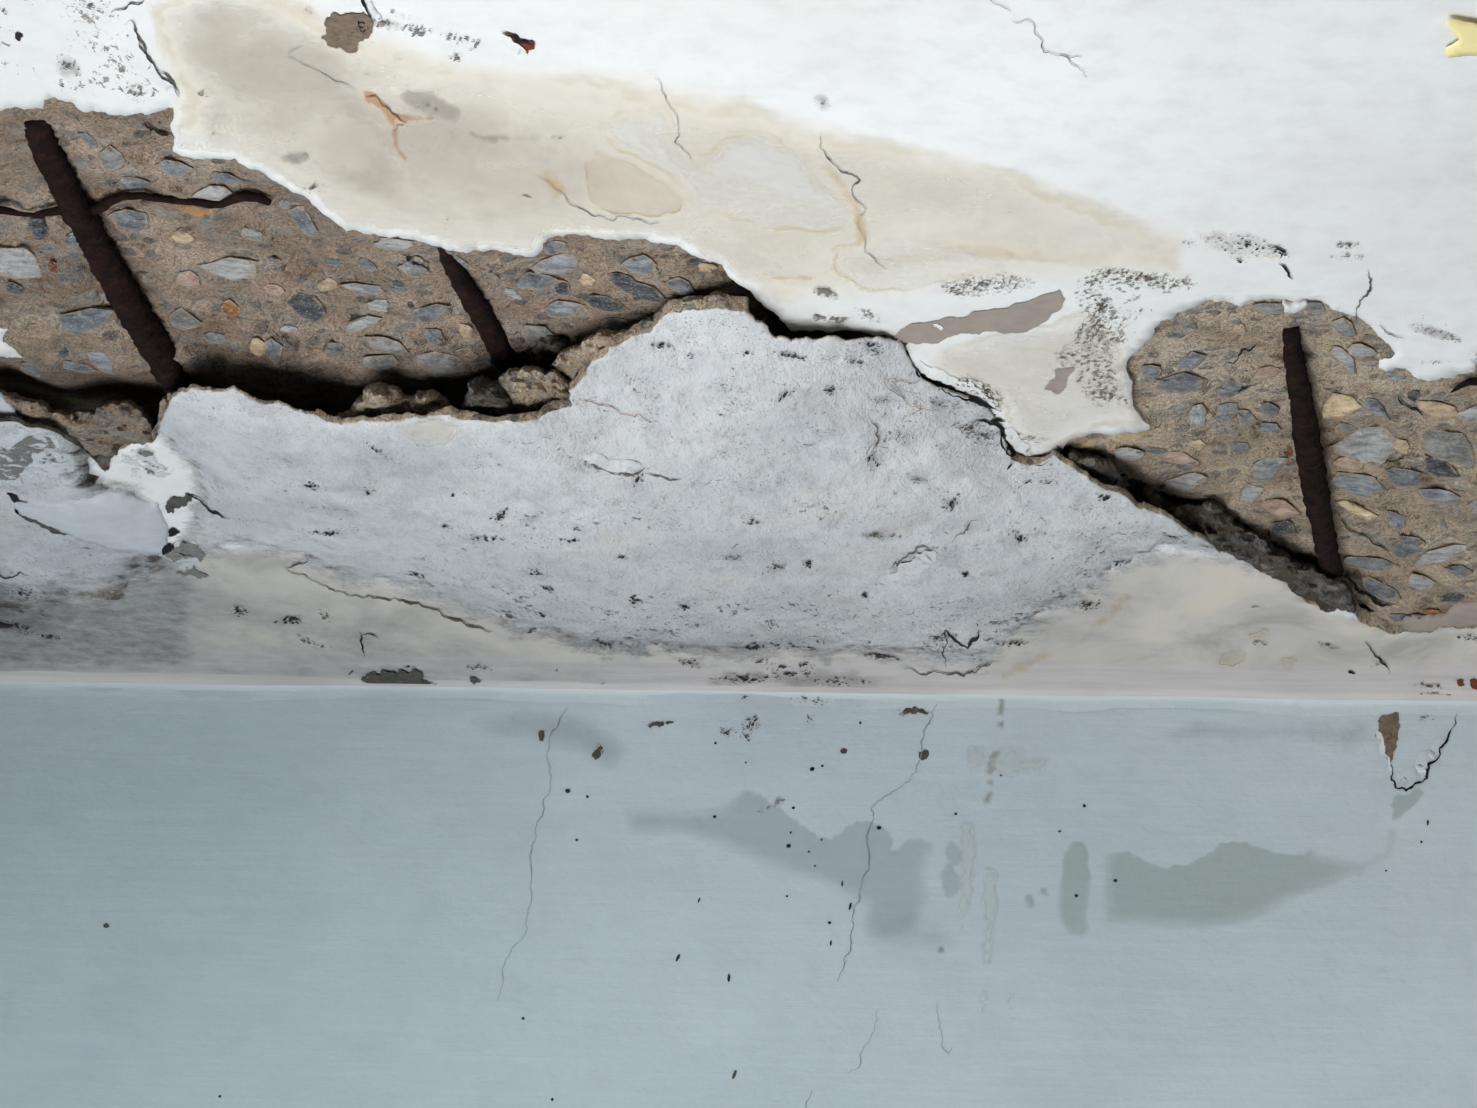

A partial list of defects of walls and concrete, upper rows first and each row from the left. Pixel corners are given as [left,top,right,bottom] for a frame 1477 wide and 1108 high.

water stain [202,17,370,100]
peeling [321,11,481,62]
water stain [399,101,532,169]
water stain [264,152,669,249]
water stain [672,142,830,204]
spalling [0,56,1065,495]
crack [869,360,1044,470]
crack [6,493,27,515]
crack [162,528,180,555]
spalling [1060,299,1477,633]
peeling [1375,712,1400,771]
crack [838,630,998,980]